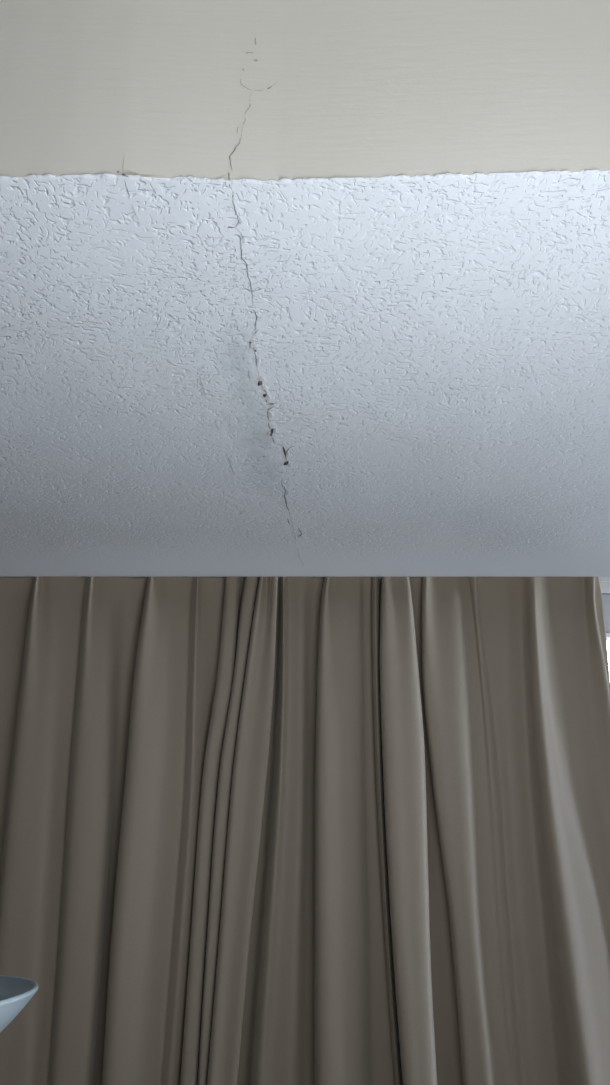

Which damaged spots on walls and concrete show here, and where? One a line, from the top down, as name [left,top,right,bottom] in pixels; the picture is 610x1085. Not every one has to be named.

crack [228,37,304,565]